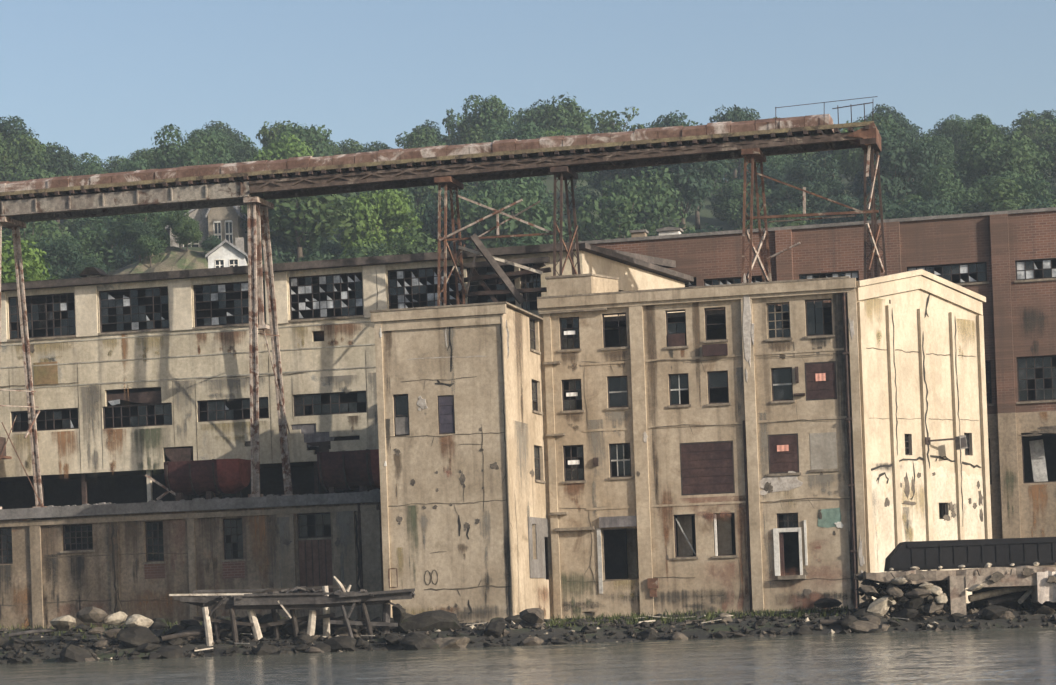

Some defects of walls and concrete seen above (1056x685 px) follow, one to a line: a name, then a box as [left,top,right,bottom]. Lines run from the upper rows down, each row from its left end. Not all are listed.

corrosion [52,431,75,475]
corrosion [107,428,123,450]
crack [871,455,981,471]
spalling [422,503,480,540]
peeling [858,458,985,584]
water stain [33,518,59,613]
water stain [563,598,598,617]
water stain [654,590,725,615]